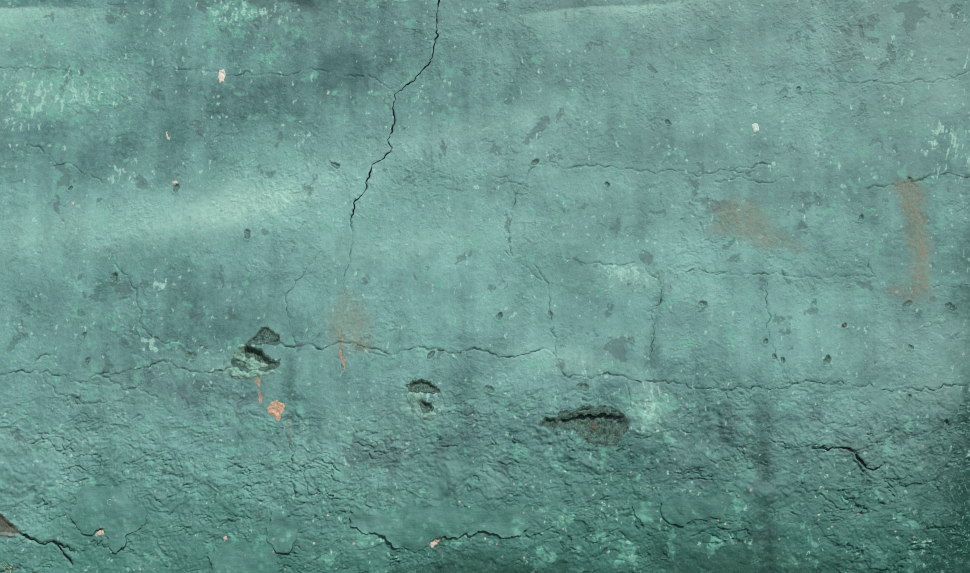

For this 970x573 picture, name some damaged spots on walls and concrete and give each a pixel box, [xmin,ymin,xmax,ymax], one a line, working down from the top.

crack [350,0,440,238]
spalling [228,327,284,380]
spalling [267,400,285,421]
spalling [406,378,441,421]
spalling [532,405,630,475]
spalling [0,513,21,538]